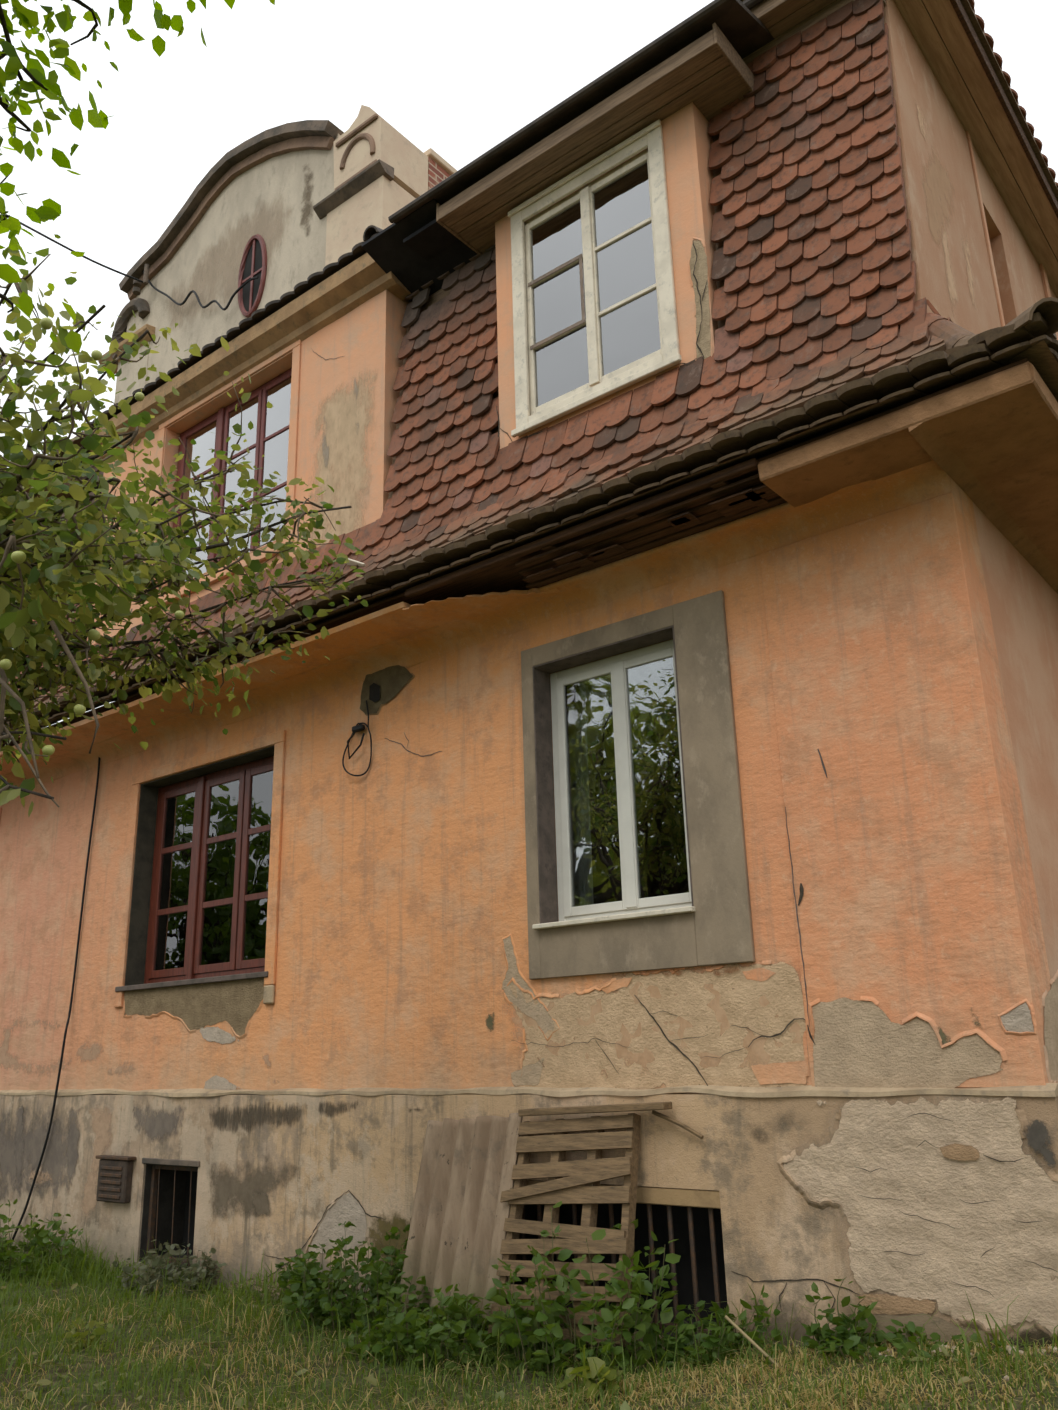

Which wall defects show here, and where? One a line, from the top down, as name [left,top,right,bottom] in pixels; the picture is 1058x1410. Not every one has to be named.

water stain [310,376,376,546]
crack [634,807,815,1086]
flaking render [123,978,264,1044]
water stain [0,1106,79,1198]
water stain [134,1106,183,1141]
water stain [211,1105,300,1132]
water stain [319,1103,358,1116]
flaking render [486,934,1058,1338]
water stain [1024,1120,1056,1167]
water stain [211,1166,296,1216]